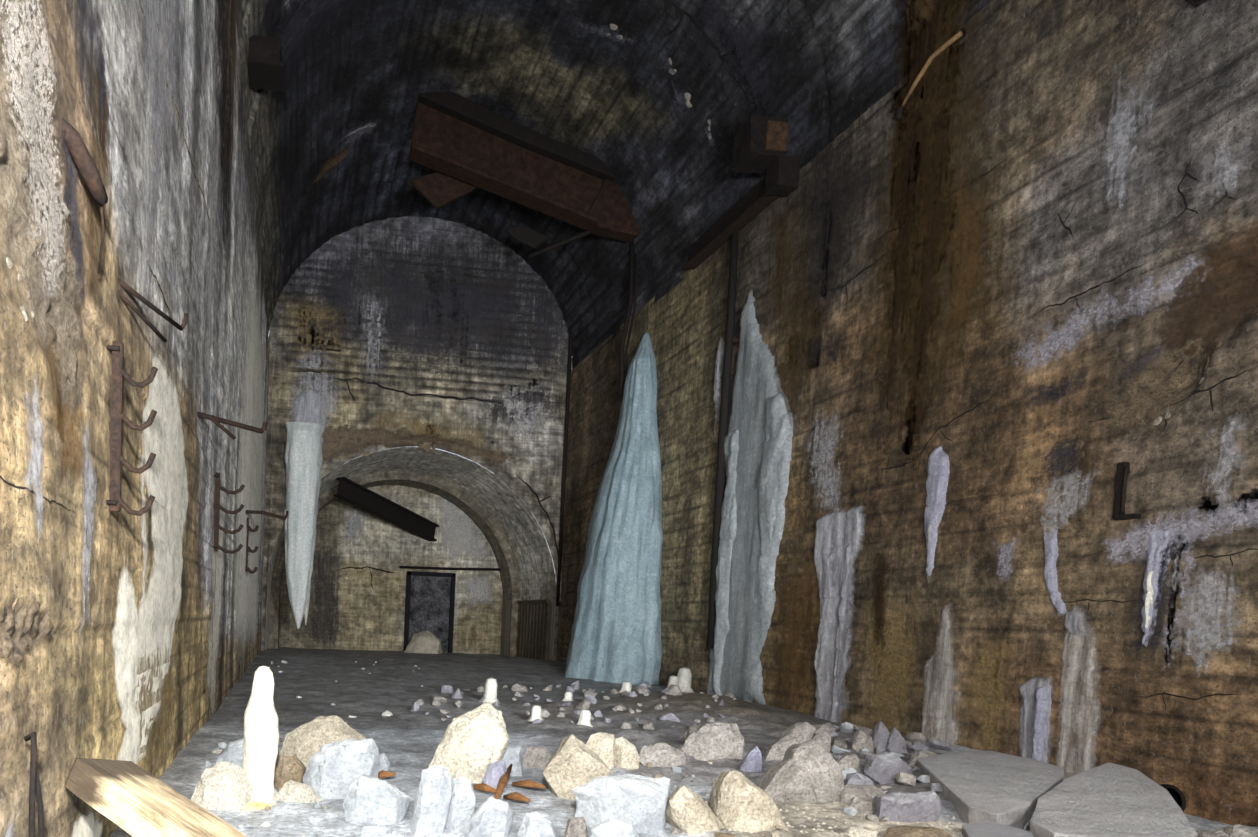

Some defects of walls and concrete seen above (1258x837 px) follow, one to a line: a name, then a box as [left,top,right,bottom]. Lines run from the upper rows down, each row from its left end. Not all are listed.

leakage [1017,259,1198,372]
crack [0,476,74,511]
leakage [112,352,188,764]
leakage [1106,420,1258,674]